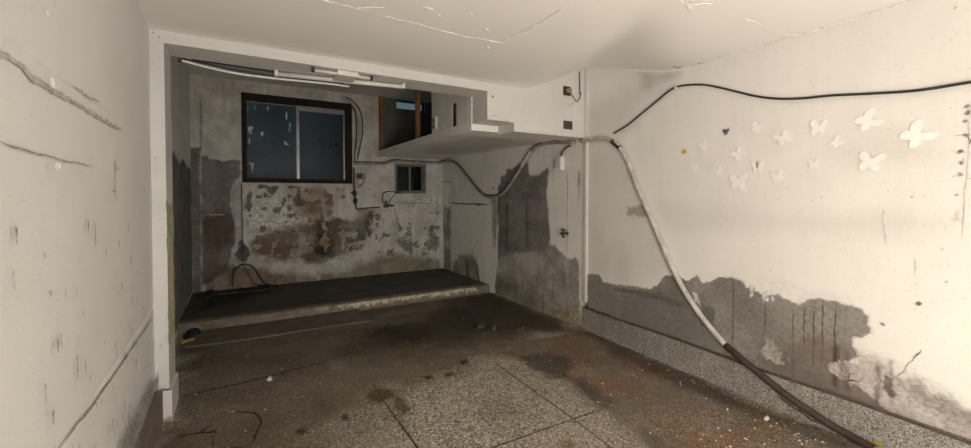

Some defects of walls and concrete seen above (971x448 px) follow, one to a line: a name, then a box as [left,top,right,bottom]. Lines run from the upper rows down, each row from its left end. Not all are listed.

peeling [166,148,451,341]
peeling [316,287,477,311]
peeling [495,163,896,409]